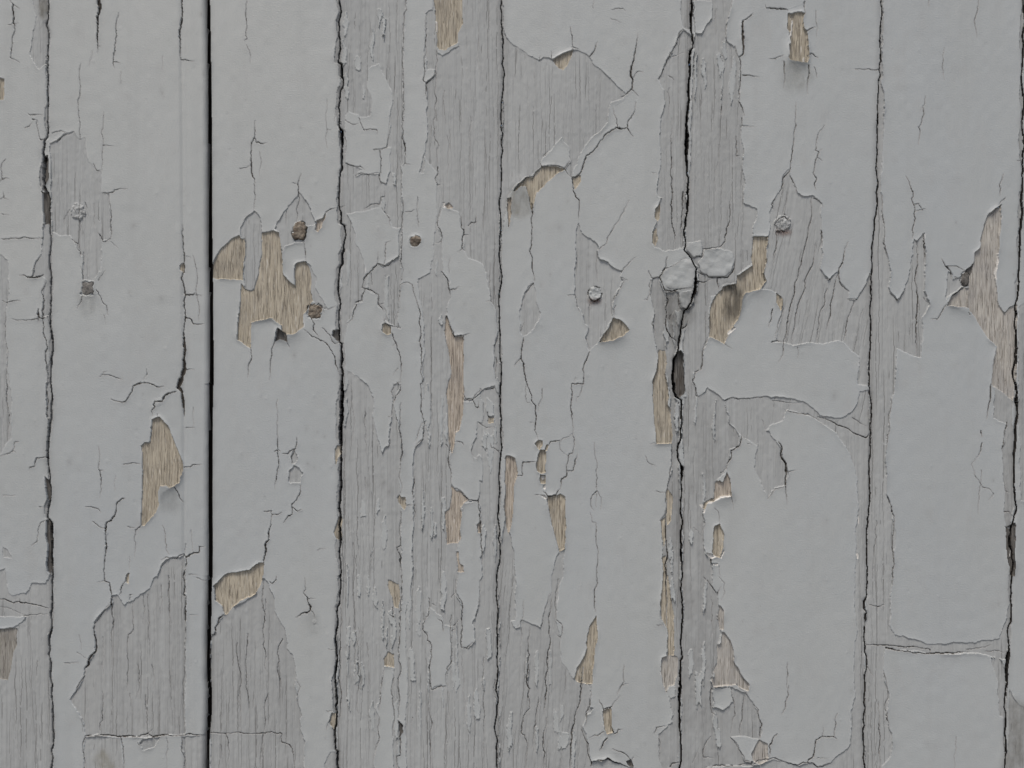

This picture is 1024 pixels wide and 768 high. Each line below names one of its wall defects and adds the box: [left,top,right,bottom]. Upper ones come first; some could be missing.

peeling [29,0,113,435]
crack [26,0,128,324]
crack [987,160,1021,217]
peeling [140,416,185,527]
peeling [69,555,307,768]
peeling [213,0,639,768]
crack [64,0,867,768]
peeling [651,0,1024,768]
crack [869,496,895,608]